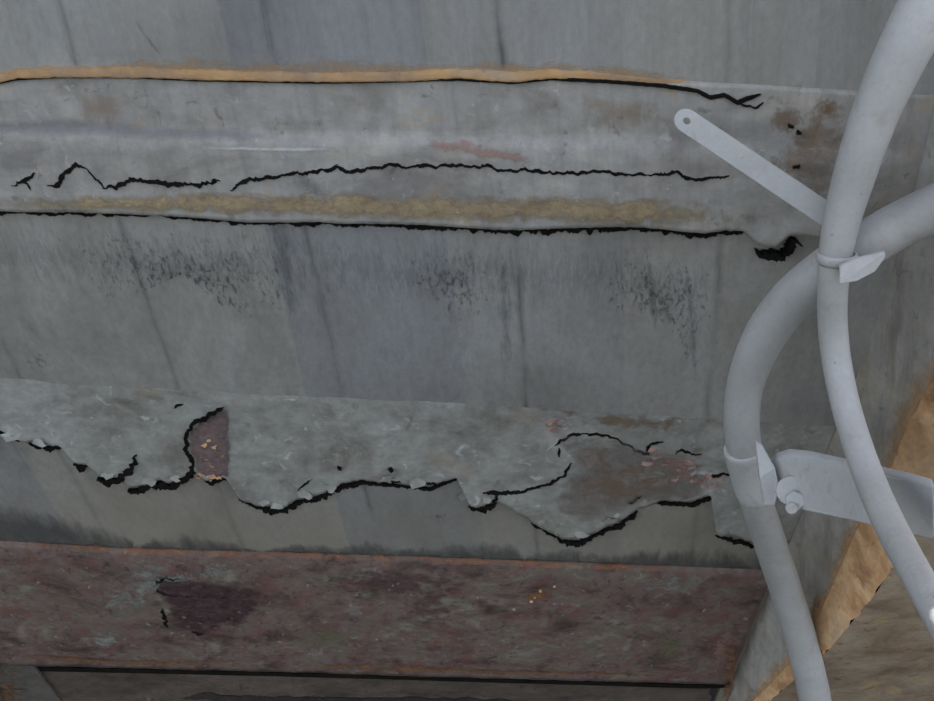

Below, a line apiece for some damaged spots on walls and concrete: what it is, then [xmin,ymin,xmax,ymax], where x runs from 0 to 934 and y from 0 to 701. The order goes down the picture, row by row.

crack [0,76,94,84]
crack [141,78,764,109]
crack [0,162,804,262]
spalling [190,411,230,482]